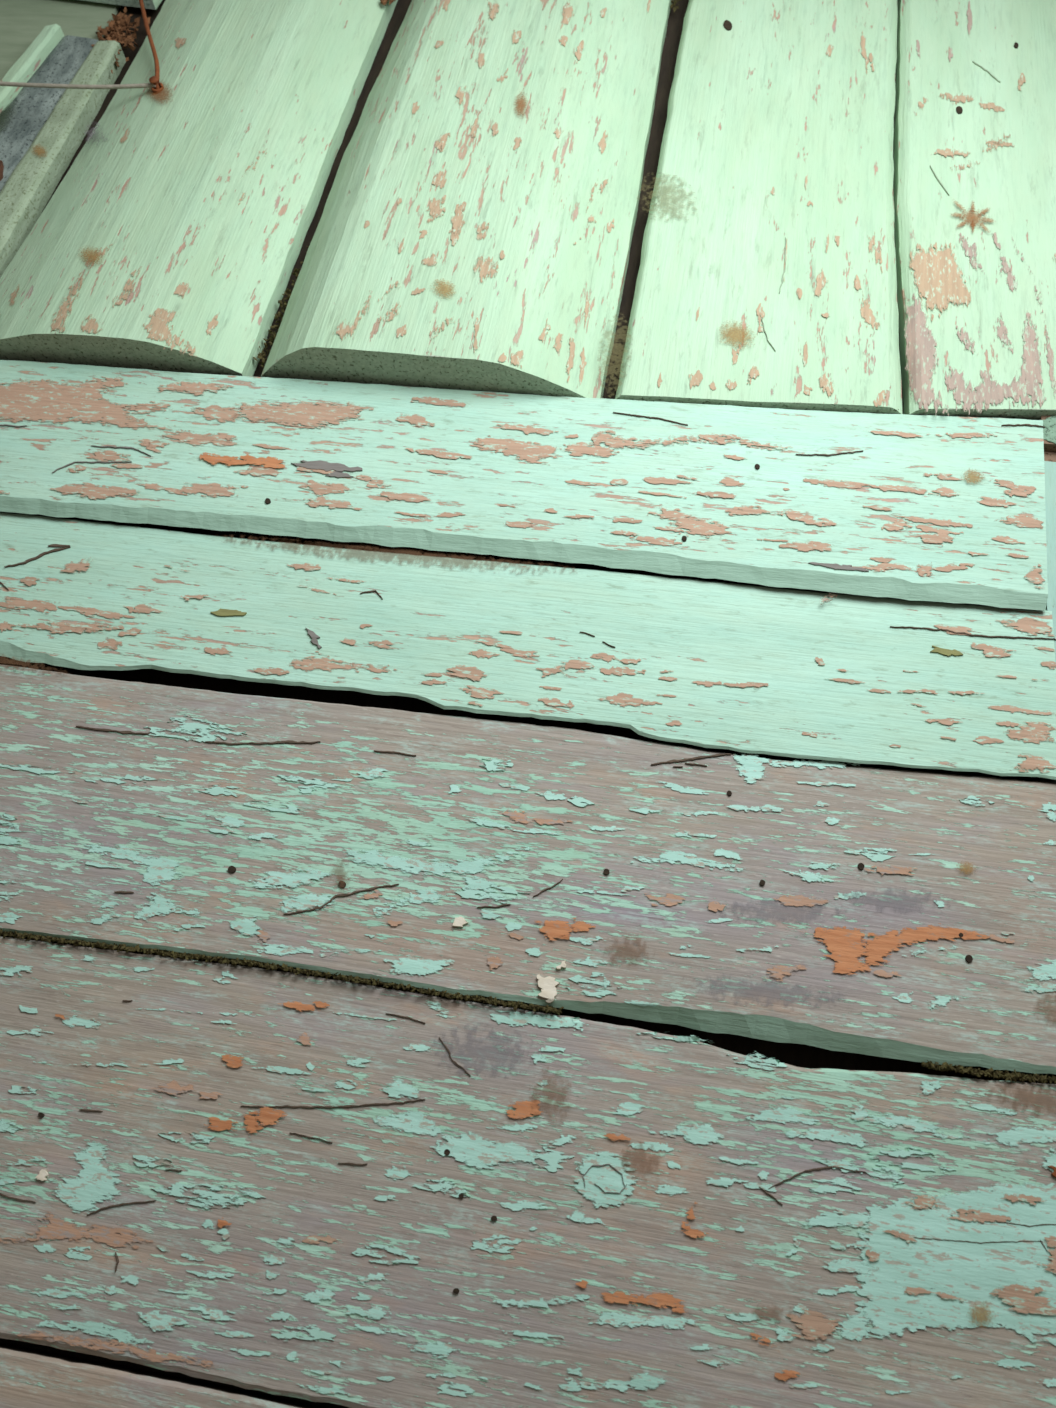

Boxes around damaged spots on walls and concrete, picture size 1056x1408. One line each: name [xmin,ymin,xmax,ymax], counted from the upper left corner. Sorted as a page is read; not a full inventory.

peeling [904,233,1056,445]
peeling [0,376,373,500]
peeling [405,424,792,474]
peeling [565,475,837,552]
peeling [783,473,973,546]
peeling [862,479,1046,588]
peeling [421,630,769,709]
peeling [733,753,860,825]
peeling [490,1010,588,1031]
peeling [373,1078,777,1225]
peeling [745,1096,1056,1352]
peeling [29,1237,492,1397]